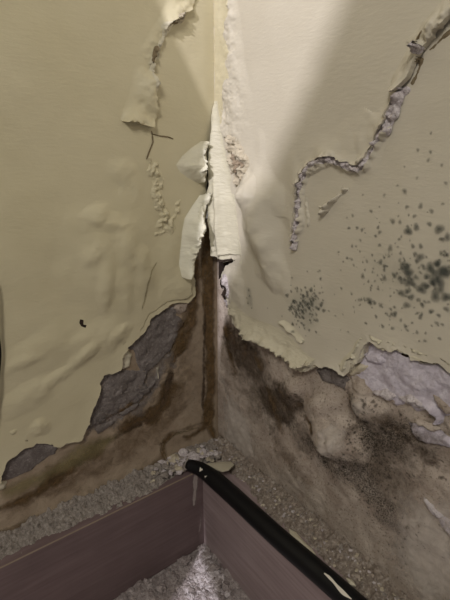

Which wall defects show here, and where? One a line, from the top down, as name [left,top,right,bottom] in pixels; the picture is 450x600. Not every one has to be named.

leakage [0,227,253,509]
peeling [0,0,256,532]
crack [146,131,173,159]
peeling [217,258,450,600]
leakage [223,322,450,600]
crack [271,91,404,251]
leakage [418,261,450,300]